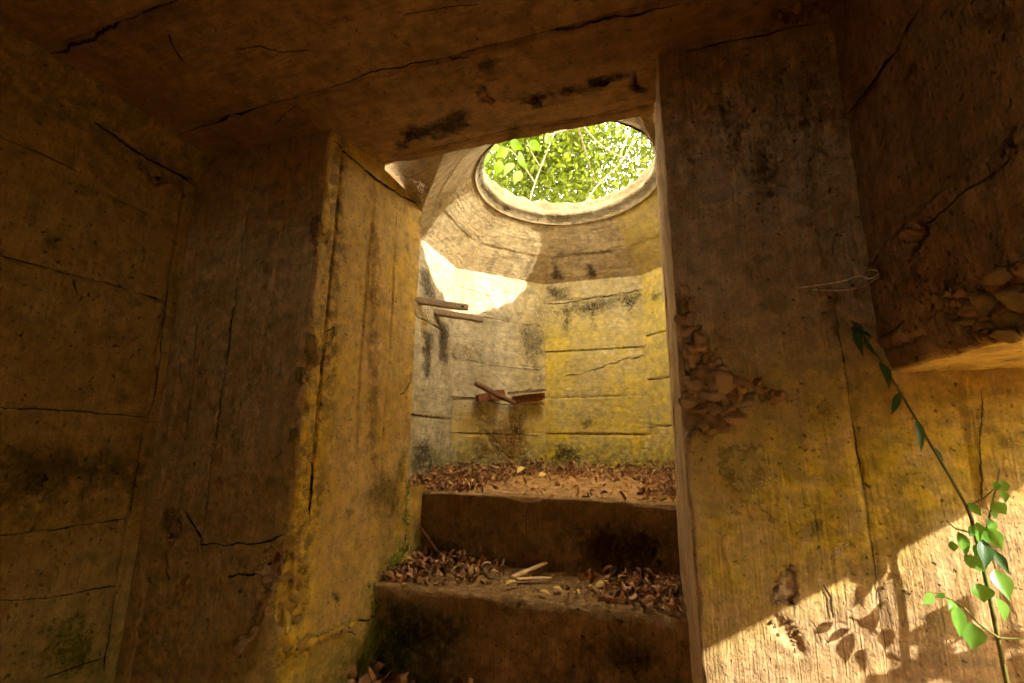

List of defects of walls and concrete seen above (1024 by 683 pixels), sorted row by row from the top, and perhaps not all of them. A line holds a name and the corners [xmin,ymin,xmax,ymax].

crack [179,3,687,135]
leakage [396,111,470,149]
leakage [529,74,625,108]
spalling [385,154,444,211]
leakage [422,271,435,299]
spalling [937,261,1024,344]
crack [184,287,285,578]
leakage [423,322,448,375]
crack [399,317,671,462]
spalling [408,227,788,504]
crack [835,313,888,677]
spalling [770,563,803,653]